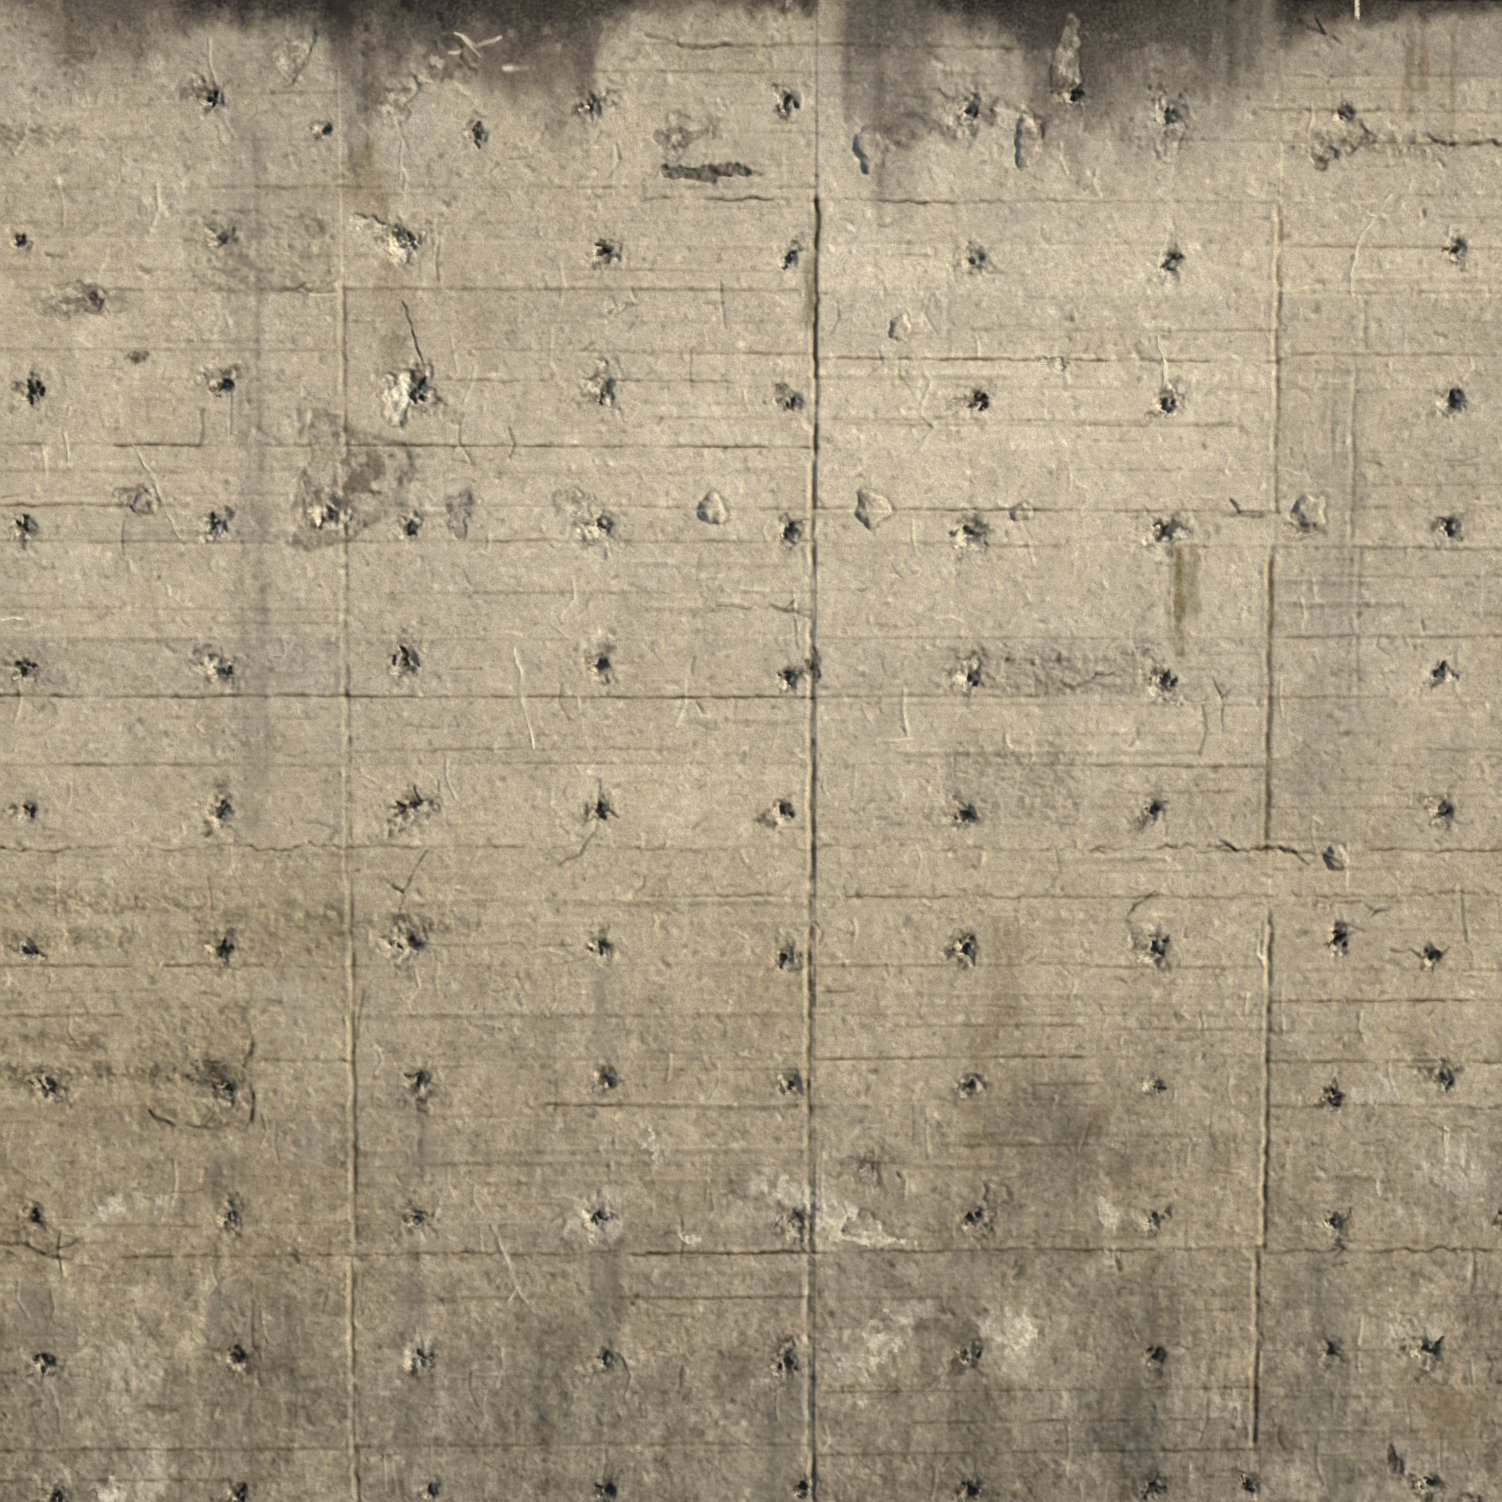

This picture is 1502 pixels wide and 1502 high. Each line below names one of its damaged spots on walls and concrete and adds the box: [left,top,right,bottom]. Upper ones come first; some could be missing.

water stain [86,0,633,102]
water stain [854,0,1234,115]
water stain [1281,0,1502,27]
spalling [653,112,749,184]
spalling [380,372,432,424]
spalling [298,416,409,547]
rust [1175,548,1194,632]
water stain [729,1174,917,1263]
water stain [566,1187,623,1336]
water stain [833,1300,948,1372]
water stain [977,1307,1037,1374]
water stain [92,1442,176,1502]